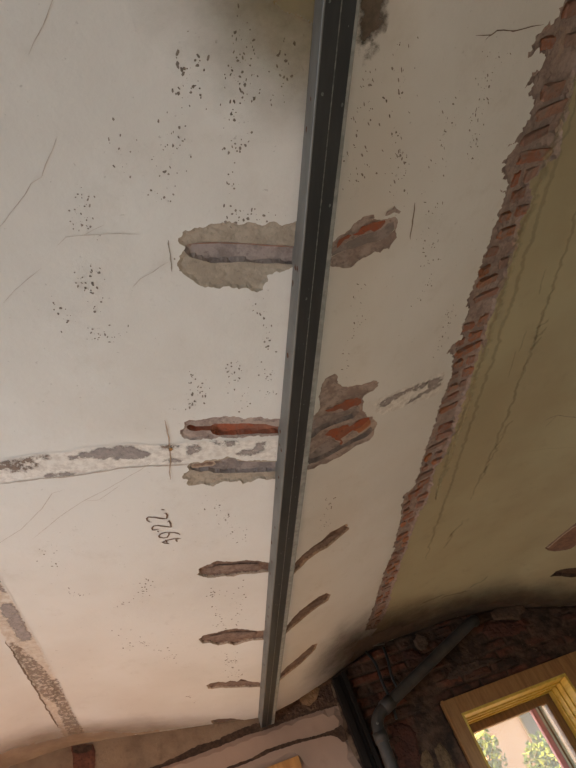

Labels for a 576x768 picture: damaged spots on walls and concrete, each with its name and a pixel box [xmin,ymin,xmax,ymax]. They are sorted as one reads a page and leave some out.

damp [359,0,387,45]
crack [476,24,544,37]
spalling [177,204,296,328]
flaking render [325,0,576,629]
peeling [0,423,278,484]
peeling [0,578,84,734]